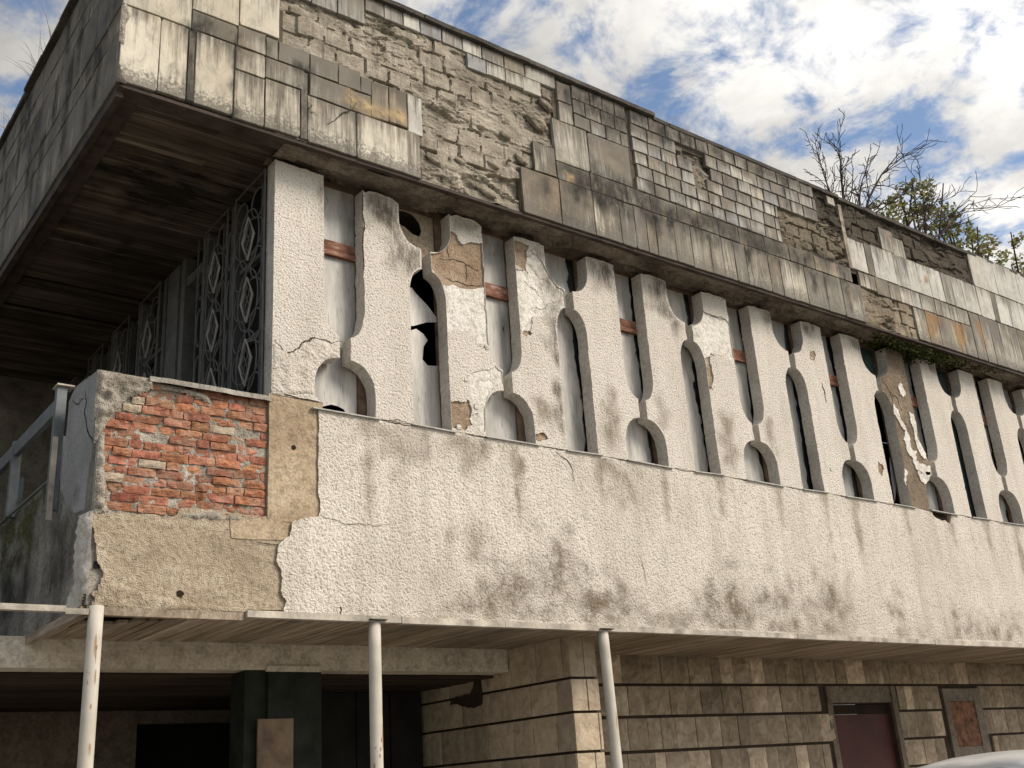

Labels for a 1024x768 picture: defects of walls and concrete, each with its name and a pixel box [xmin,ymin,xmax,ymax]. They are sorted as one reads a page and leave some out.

spalling [431,232,489,350]
crack [275,337,343,353]
peeling [451,367,502,432]
peeling [892,383,931,486]
flaking render [65,370,323,612]
leakage [546,544,565,590]
leakage [586,584,627,621]
leakage [707,585,751,629]